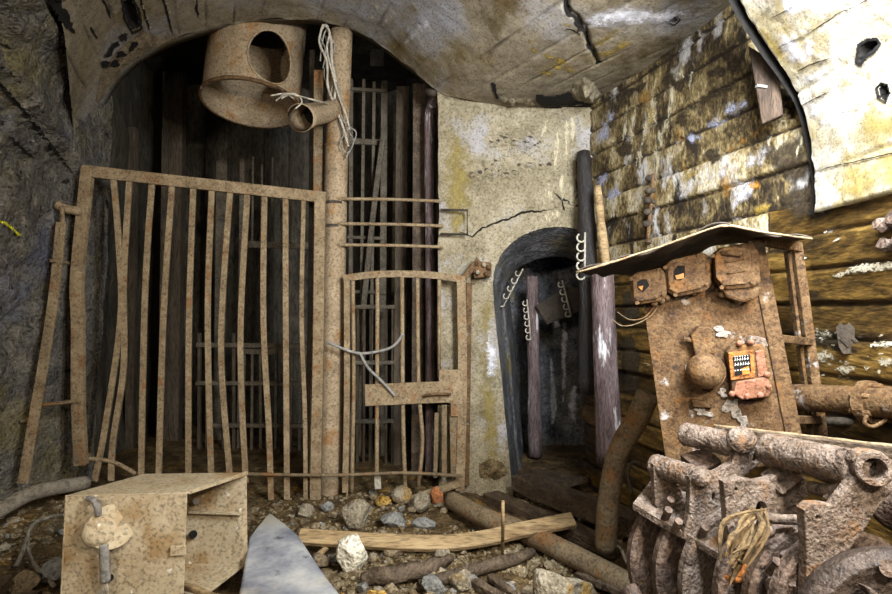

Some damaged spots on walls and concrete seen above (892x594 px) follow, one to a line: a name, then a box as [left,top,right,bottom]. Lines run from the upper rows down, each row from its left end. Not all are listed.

spalling [96,0,181,104]
crack [564,0,602,65]
hole [855,38,881,66]
spalling [499,77,602,108]
hole [875,82,891,104]
crack [447,192,578,237]